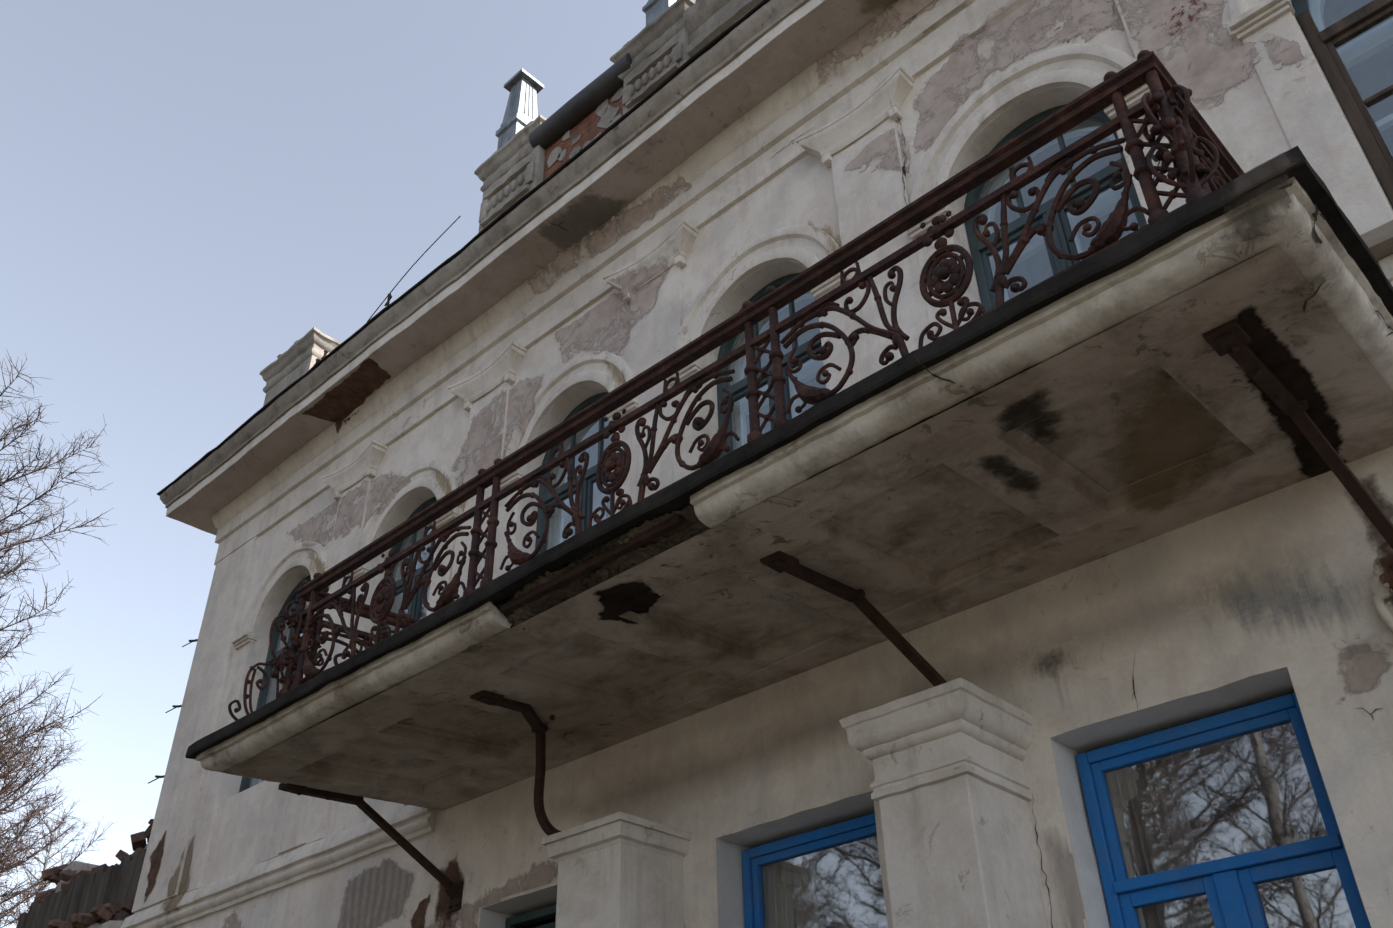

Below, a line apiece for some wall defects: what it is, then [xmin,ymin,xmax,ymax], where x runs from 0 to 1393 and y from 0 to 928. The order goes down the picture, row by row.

flaking render [817,0,938,84]
flaking render [845,0,1304,178]
flaking render [528,174,690,293]
flaking render [555,259,669,362]
leakage [999,393,1060,443]
spalling [1235,308,1347,479]
leakage [981,456,1040,492]
spalling [496,506,721,630]
rust [1376,545,1393,604]
flaking render [1333,630,1393,700]
flaking render [338,858,558,928]